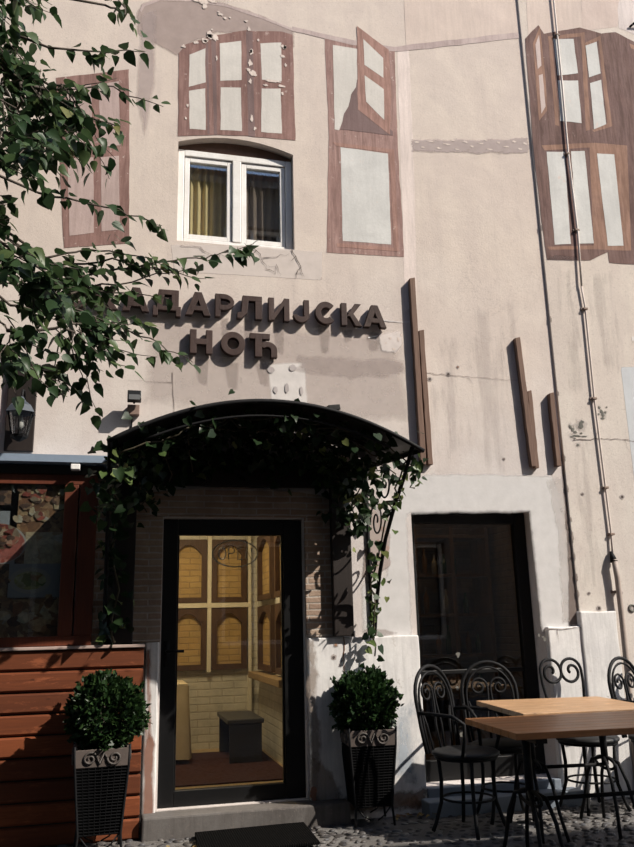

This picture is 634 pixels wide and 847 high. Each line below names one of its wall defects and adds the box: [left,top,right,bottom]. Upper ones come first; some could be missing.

peeling [194,0,231,19]
peeling [181,29,219,48]
peeling [247,39,285,95]
crack [254,250,304,276]